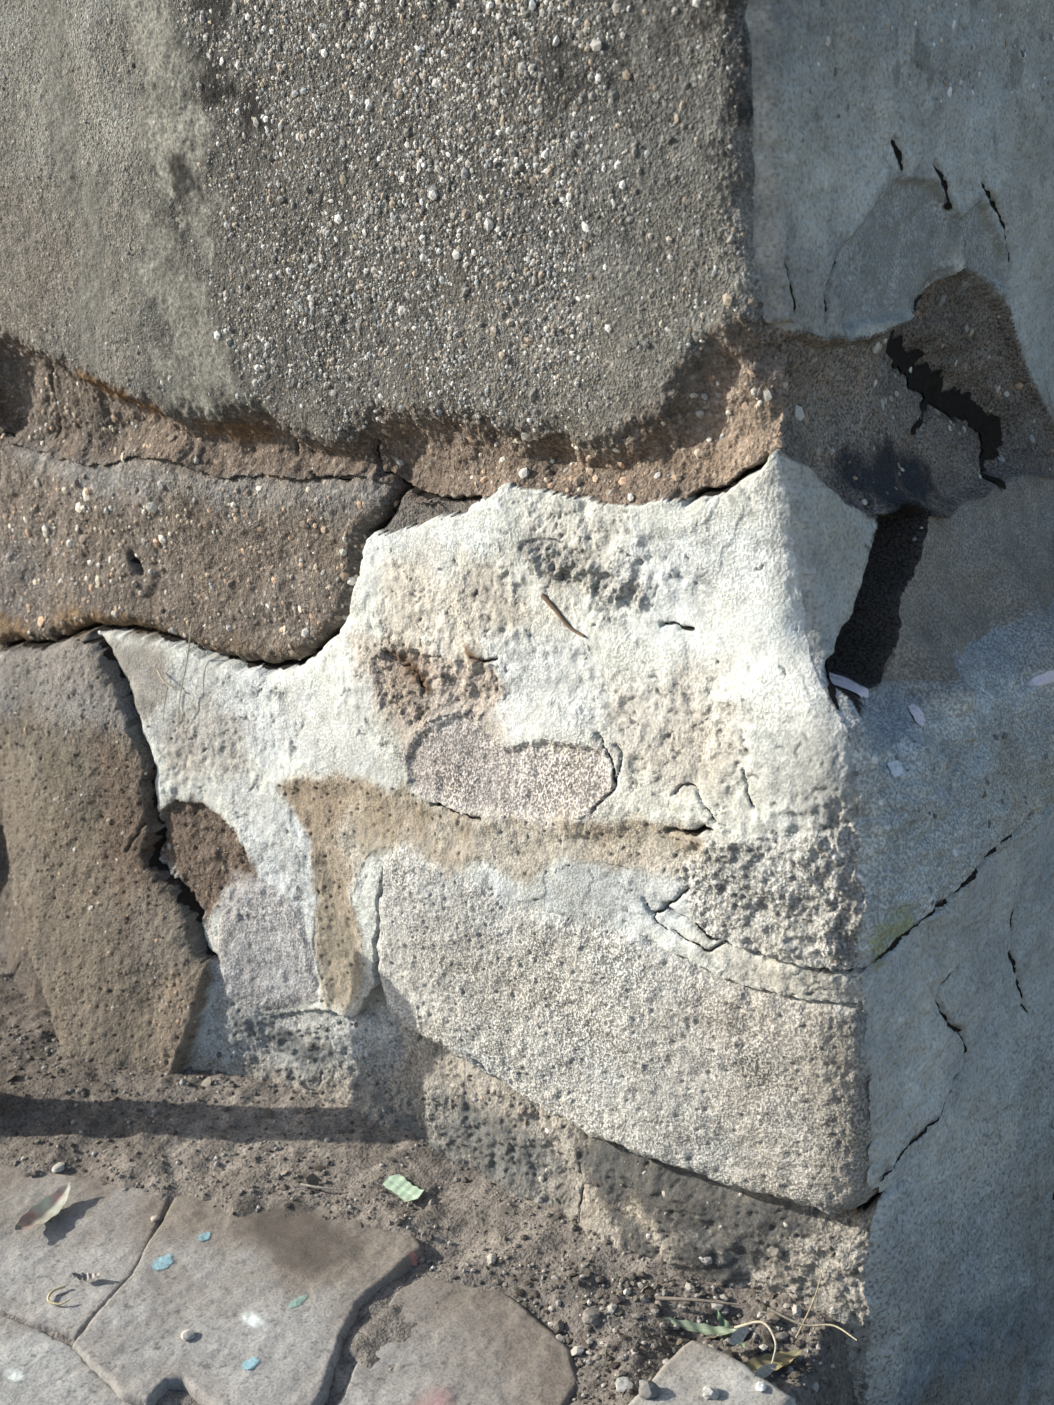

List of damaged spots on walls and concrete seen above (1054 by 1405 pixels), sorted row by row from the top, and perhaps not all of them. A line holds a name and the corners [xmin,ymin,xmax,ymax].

spalling [0,166,1054,673]
spalling [367,642,509,729]
spalling [8,690,151,933]
crack [647,889,726,952]